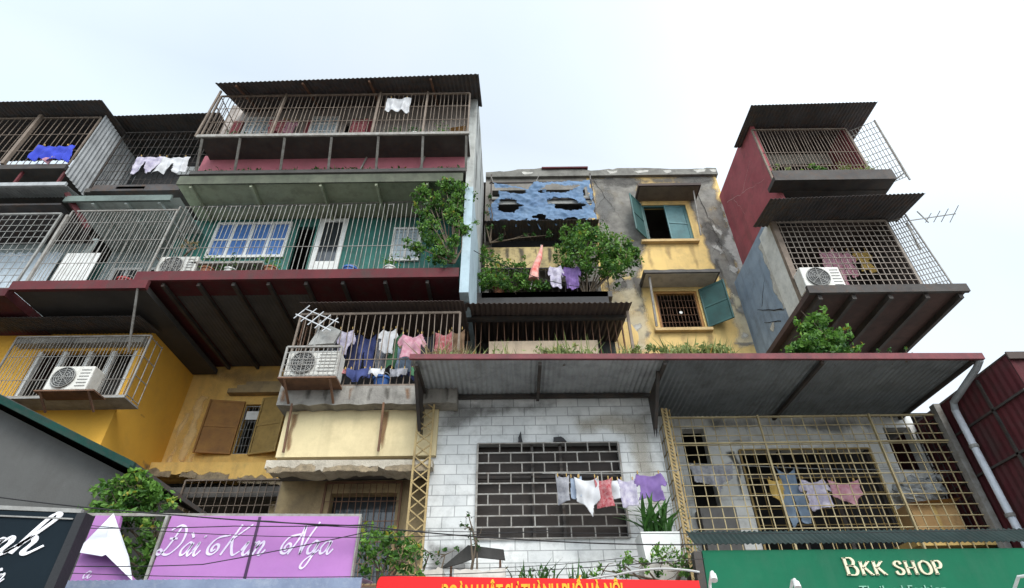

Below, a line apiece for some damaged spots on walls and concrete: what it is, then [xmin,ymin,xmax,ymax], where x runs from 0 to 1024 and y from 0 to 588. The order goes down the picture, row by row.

peeling [712,204,743,274]
peeling [729,294,754,346]
spalling [148,397,428,485]
damp [448,406,510,427]